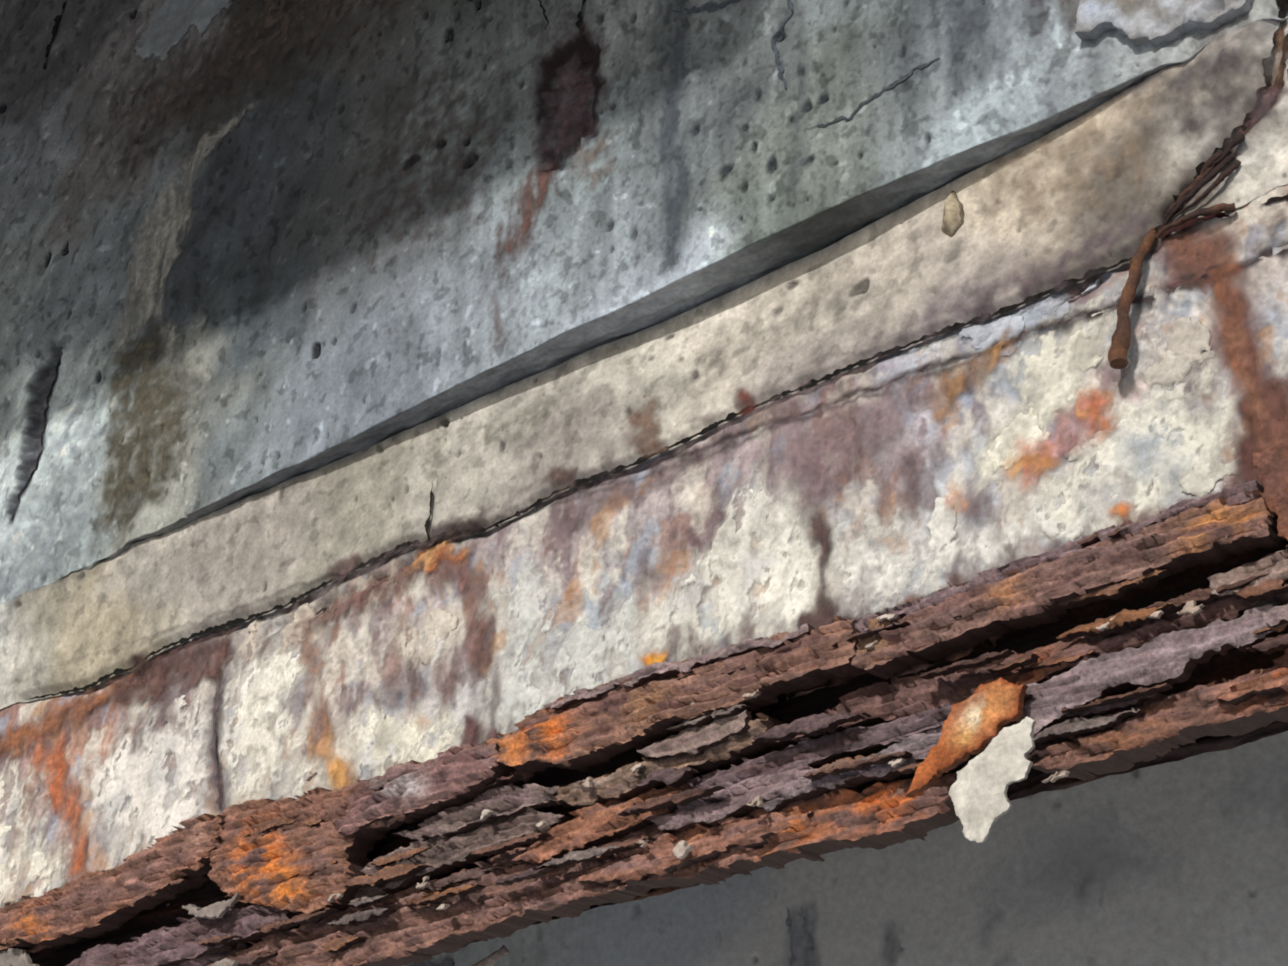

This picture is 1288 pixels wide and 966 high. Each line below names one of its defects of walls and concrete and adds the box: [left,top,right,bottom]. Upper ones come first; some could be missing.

peeling [113,102,255,359]
rust [497,166,553,253]
crack [771,0,793,89]
crack [804,58,940,130]
flaking render [1074,0,1253,47]
crack [1152,0,1288,240]
rust [1239,28,1285,134]
spalling [7,345,63,522]
leakage [98,328,188,529]
crack [25,257,1132,700]
rust [0,231,1288,966]
peeling [88,242,1288,859]